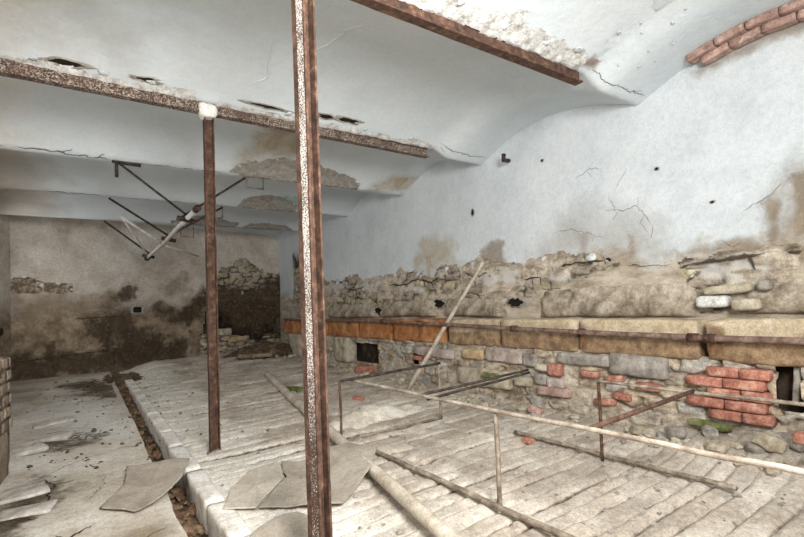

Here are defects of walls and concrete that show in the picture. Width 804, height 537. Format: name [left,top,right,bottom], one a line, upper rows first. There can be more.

flaking render [399,0,588,70]
flaking render [0,55,197,100]
crack [0,145,117,160]
flaking render [320,165,361,190]
leakage [787,176,804,239]
flaking render [10,276,73,294]
leakage [101,286,136,301]
leakage [152,288,206,326]
leakage [217,275,281,343]
flaking render [324,243,620,316]
flaking render [678,240,804,315]
leakage [11,313,188,381]